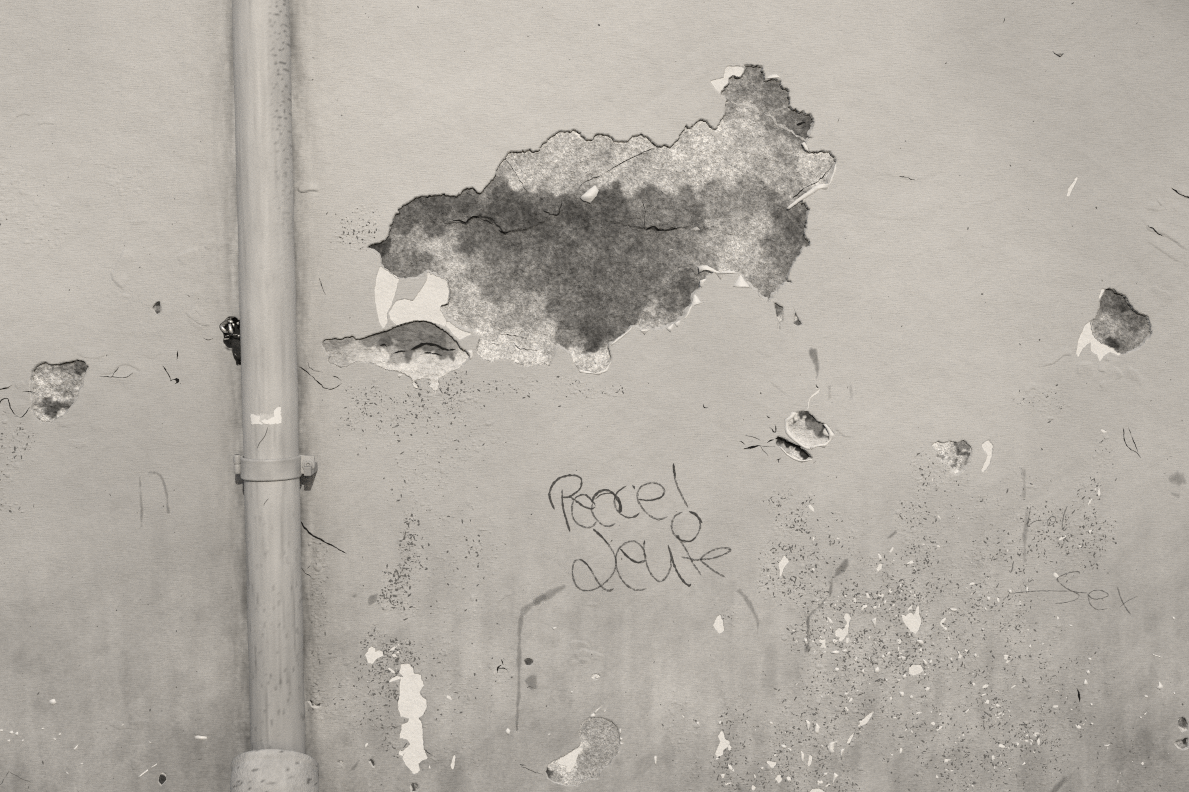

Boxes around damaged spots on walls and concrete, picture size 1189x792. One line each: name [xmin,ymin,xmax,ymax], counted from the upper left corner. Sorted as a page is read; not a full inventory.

flaking render [321,64,837,396]
flaking render [1076,288,1153,361]
flaking render [29,359,89,423]
flaking render [775,410,835,462]
flaking render [931,440,993,476]
peeling [883,599,923,645]
peeling [804,613,932,699]
peeling [389,664,427,792]
flaking render [545,704,623,787]
peeling [715,721,730,757]
peeling [752,745,812,790]
peeling [828,713,873,758]